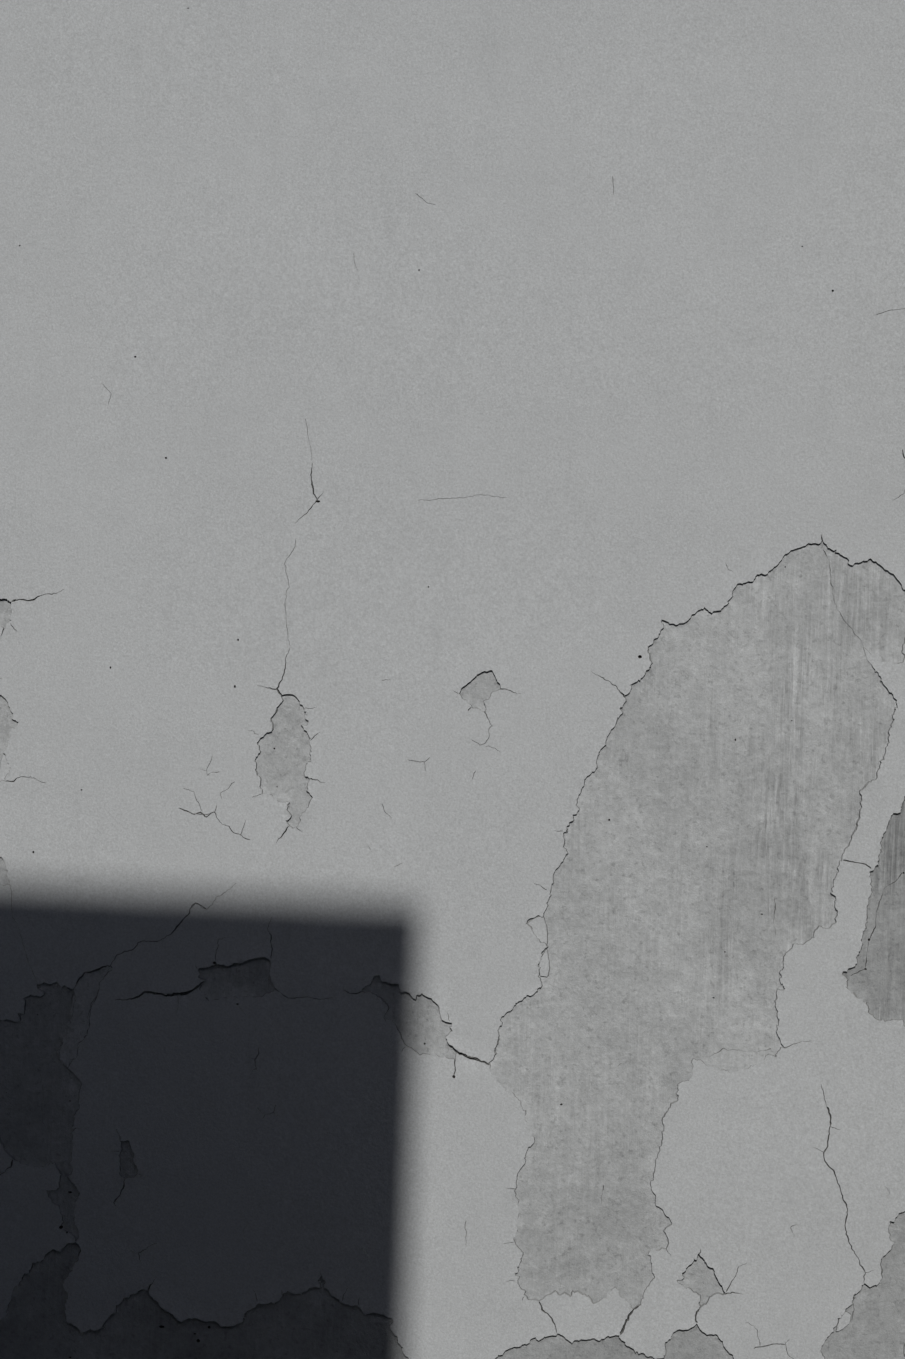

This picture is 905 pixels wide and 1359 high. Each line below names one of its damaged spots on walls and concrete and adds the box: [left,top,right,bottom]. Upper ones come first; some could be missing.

crack [284,419,320,645]
crack [12,589,64,602]
peeling [0,695,45,783]
peeling [248,648,325,845]
peeling [454,670,521,727]
crack [69,883,238,1065]
peeling [195,917,275,1005]
peeling [361,975,457,1075]
crack [457,1051,489,1065]
peeling [488,535,905,1359]
crack [816,1086,873,1280]
peeling [0,1242,408,1359]